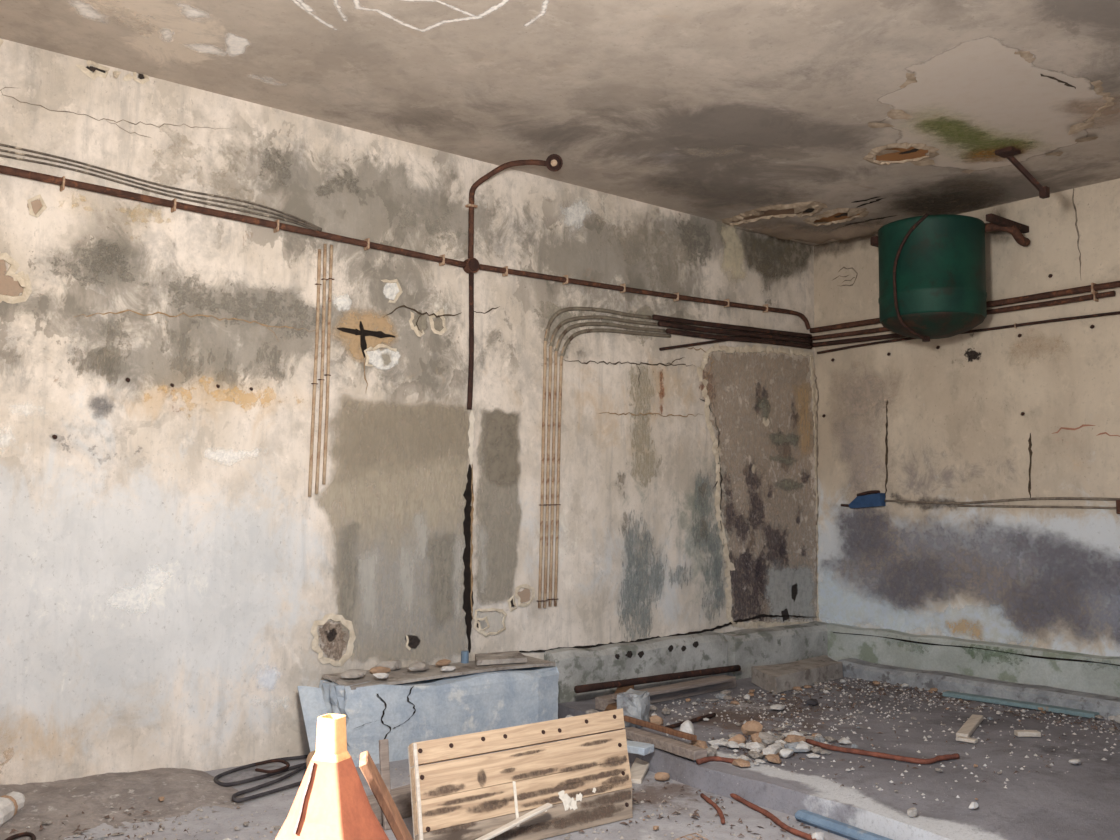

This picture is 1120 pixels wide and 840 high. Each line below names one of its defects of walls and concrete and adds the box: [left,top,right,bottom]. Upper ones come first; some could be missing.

crack [0,87,229,138]
peeling [863,36,1116,174]
spalling [721,201,869,226]
water stain [904,180,1002,216]
water stain [169,277,322,336]
crack [383,305,498,331]
peeling [697,344,819,629]
crack [519,347,1120,666]
water stain [892,495,956,509]
water stain [818,510,1120,643]
spalling [311,613,555,690]
crack [354,686,416,739]